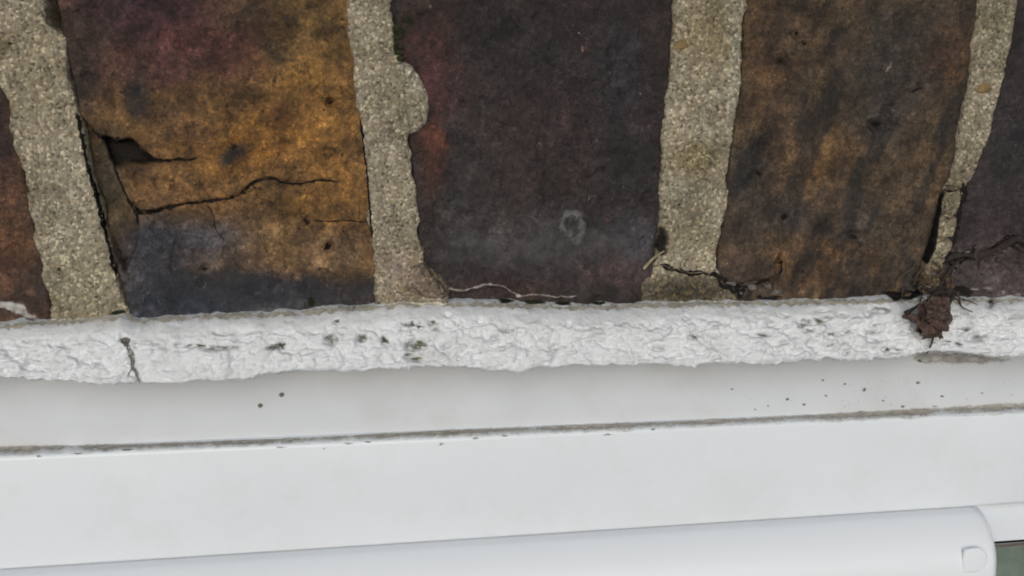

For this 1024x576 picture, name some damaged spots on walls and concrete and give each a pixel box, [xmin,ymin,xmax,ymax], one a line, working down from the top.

spalling [91,129,158,220]
crack [144,152,199,162]
crack [133,177,336,242]
crack [954,235,1017,270]
crack [661,263,783,300]
crack [120,337,140,383]